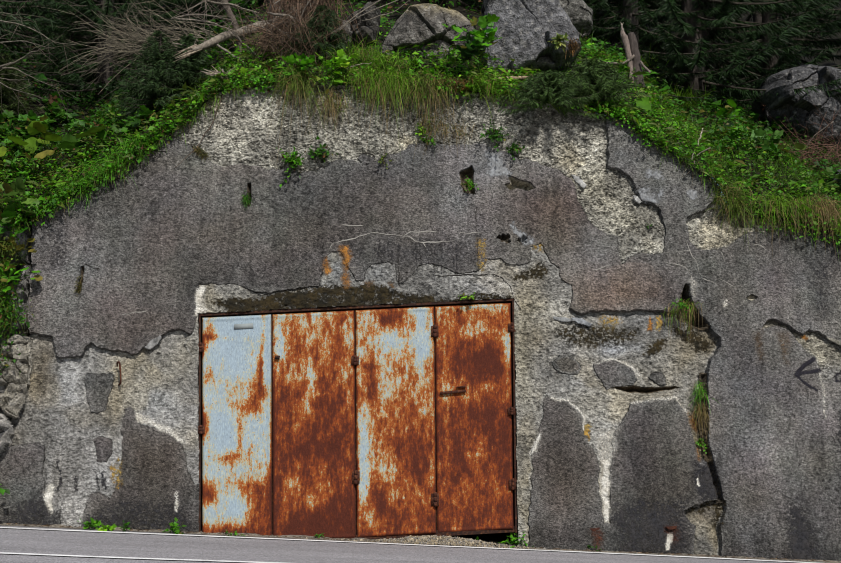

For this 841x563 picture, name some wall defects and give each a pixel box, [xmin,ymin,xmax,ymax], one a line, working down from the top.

flaking render [169,82,665,265]
damp [87,492,191,531]
damp [135,412,184,442]
flaking render [0,222,724,555]
damp [598,428,688,553]
damp [694,462,721,501]